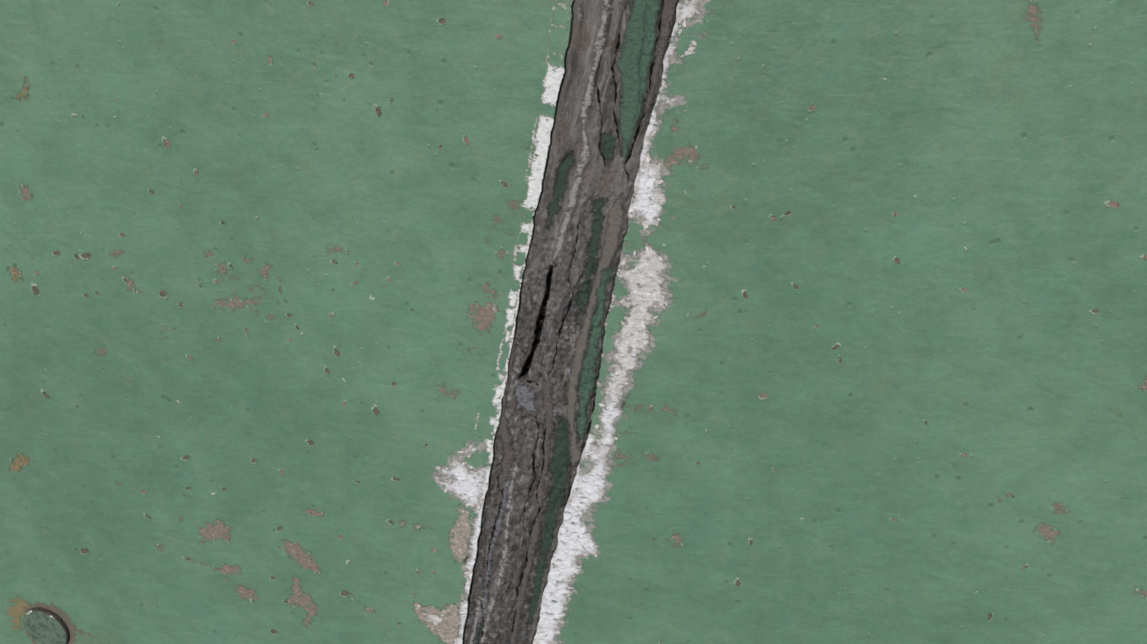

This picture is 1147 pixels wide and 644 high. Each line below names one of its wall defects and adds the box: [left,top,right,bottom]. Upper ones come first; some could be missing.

crack [595,0,664,180]
peeling [197,250,299,342]
peeling [412,0,573,644]
crack [520,226,578,385]
crack [581,349,603,456]
peeling [533,0,711,644]
peeling [276,526,322,627]
crack [480,415,572,642]